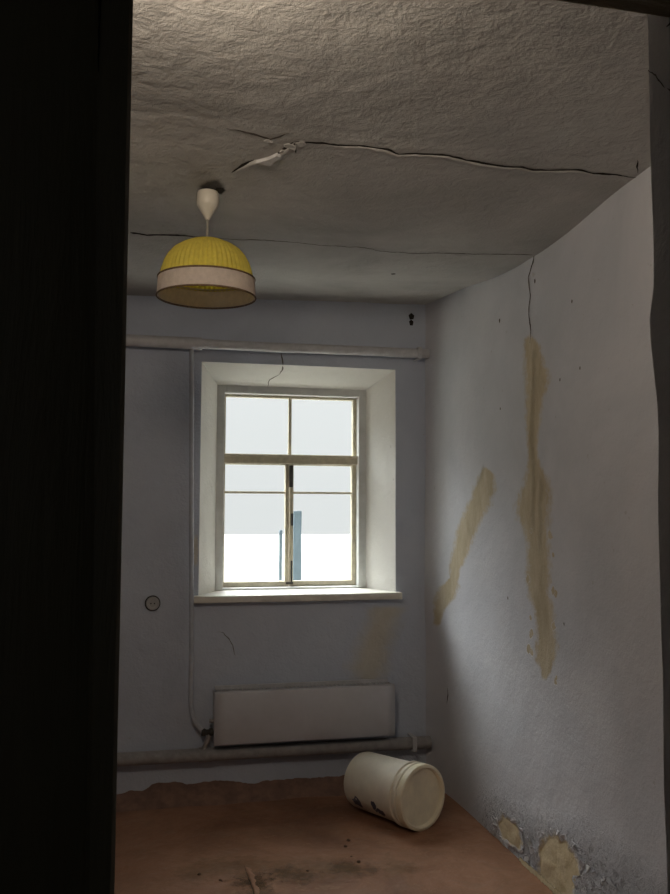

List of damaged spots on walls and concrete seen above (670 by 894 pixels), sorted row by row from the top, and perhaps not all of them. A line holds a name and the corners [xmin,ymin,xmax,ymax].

crack [226,128,638,182]
crack [499,254,535,338]
leakage [430,466,500,627]
leakage [509,333,562,686]
spalling [489,809,621,894]